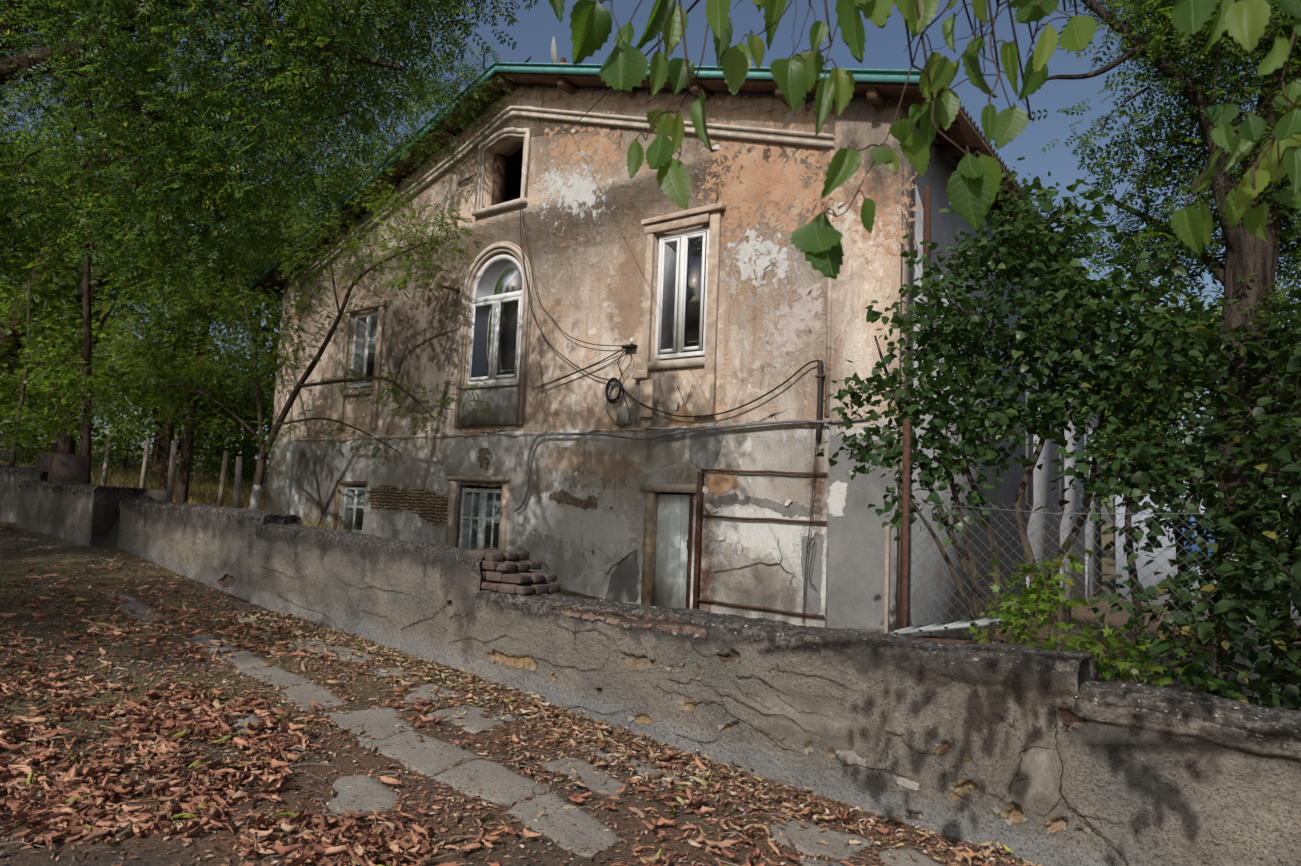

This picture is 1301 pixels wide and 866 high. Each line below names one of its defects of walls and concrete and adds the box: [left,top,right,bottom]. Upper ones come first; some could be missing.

peeling [532,106,637,230]
peeling [697,108,919,375]
spalling [366,448,511,526]
peeling [514,440,643,565]
peeling [702,468,847,575]
spalling [486,650,556,681]
crack [655,636,956,790]
crack [989,710,1129,865]